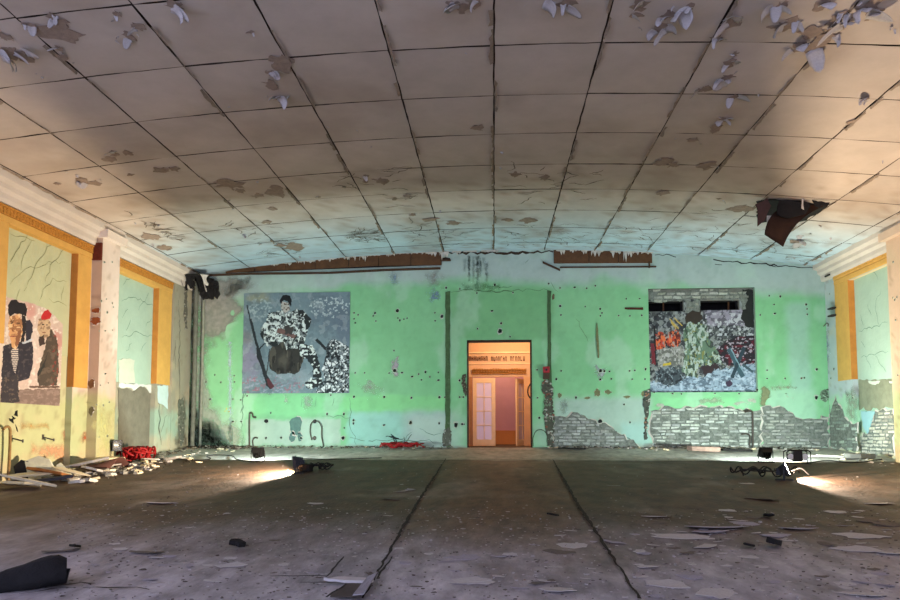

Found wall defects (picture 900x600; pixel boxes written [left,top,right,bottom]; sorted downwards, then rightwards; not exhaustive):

peeling [0,12,85,73]
peeling [163,0,189,24]
peeling [263,54,295,109]
peeling [629,0,695,47]
peeling [690,51,759,134]
peeling [761,0,896,73]
crack [333,161,835,268]
flaking render [88,358,151,447]
water stain [178,278,250,449]
flaking render [537,367,899,457]
crack [278,398,446,598]
crack [552,459,642,599]